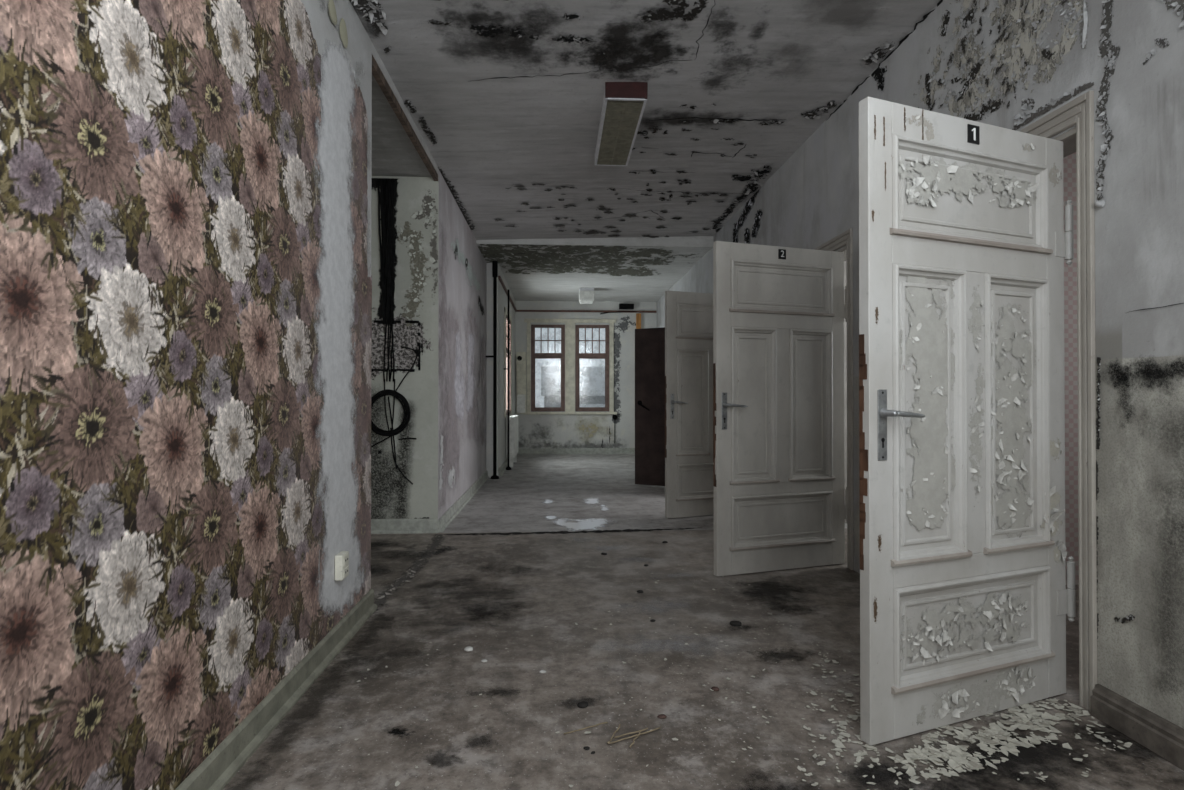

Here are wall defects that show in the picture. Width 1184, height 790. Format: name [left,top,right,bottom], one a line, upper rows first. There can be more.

mould [454,11,557,62]
crack [475,0,716,81]
leakage [565,8,683,80]
flaking render [478,104,772,277]
crack [691,118,786,158]
crack [826,0,943,121]
flaking render [914,0,1120,208]
flaking render [315,42,371,614]
flaking render [371,189,438,380]
leakage [1107,358,1184,418]
leakage [380,405,413,519]
peeling [902,592,1029,665]